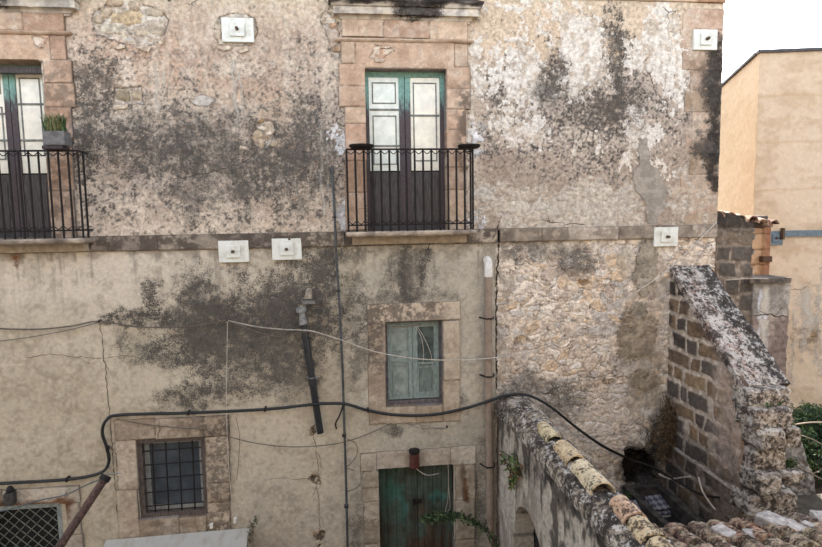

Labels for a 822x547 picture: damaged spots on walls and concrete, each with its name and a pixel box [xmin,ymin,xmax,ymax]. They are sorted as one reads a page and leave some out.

spalling [113,85,144,110]
spalling [91,0,170,52]
leakage [72,53,340,219]
spalling [239,118,277,150]
leakage [391,0,448,23]
leakage [563,12,649,137]
leakage [689,34,723,192]
leakage [99,246,458,416]
crack [753,307,795,385]
crack [30,324,144,511]
crack [268,436,321,546]
spalling [308,471,322,485]